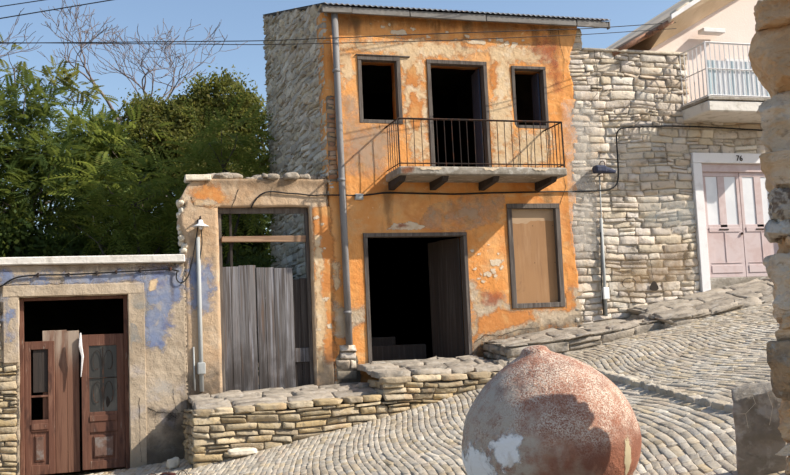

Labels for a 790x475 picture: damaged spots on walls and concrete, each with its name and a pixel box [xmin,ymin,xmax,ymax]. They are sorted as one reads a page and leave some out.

flaking render [325,23,557,182]
flaking render [176,184,226,254]
flaking render [313,235,366,373]
flaking render [469,253,582,354]